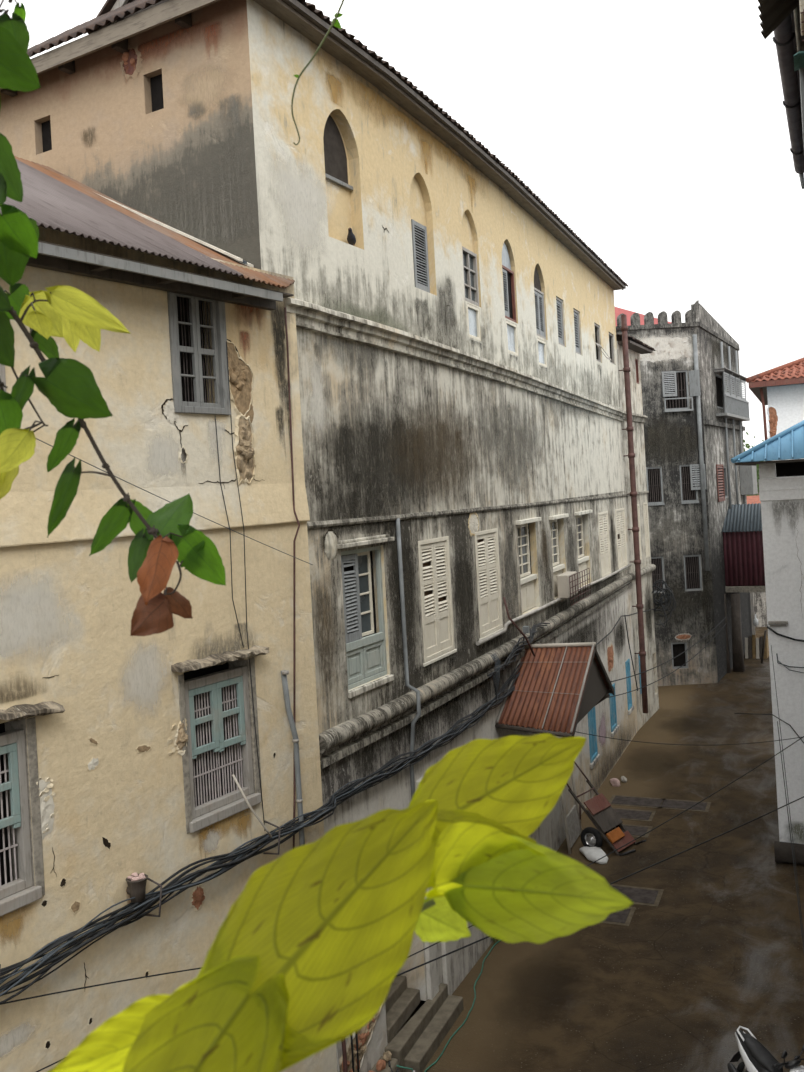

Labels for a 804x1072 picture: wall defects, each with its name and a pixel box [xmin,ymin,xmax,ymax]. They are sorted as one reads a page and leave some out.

leakage [151,189,242,244]
leakage [339,305,404,330]
leakage [640,336,693,360]
flaking render [227,340,254,419]
leakage [311,341,387,430]
crack [161,398,188,448]
leakage [644,420,697,462]
leakage [645,571,712,636]
flaking render [167,718,188,756]
flaking render [36,777,56,840]